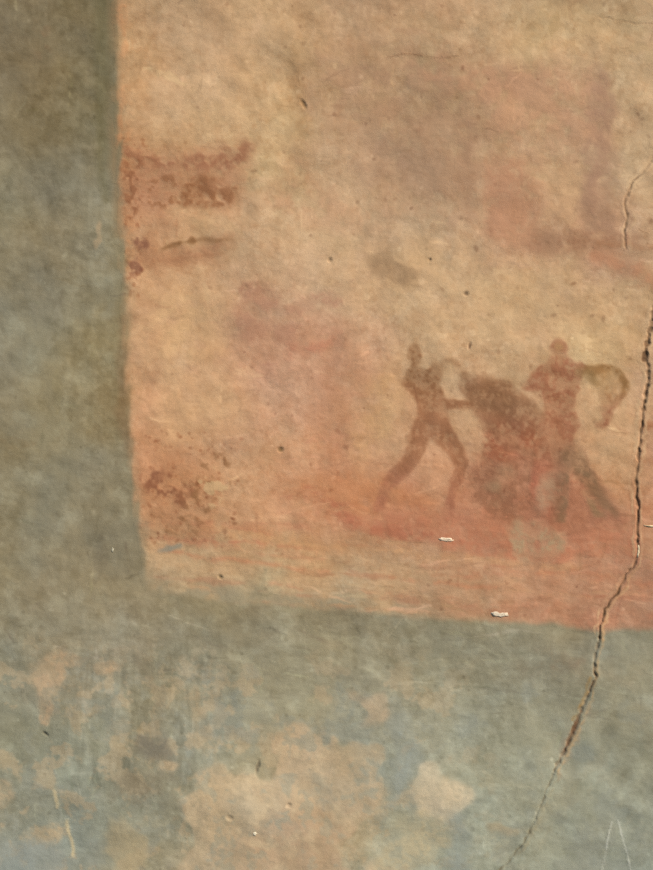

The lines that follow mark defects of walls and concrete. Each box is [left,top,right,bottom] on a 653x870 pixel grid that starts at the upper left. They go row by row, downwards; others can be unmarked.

crack [619,138,653,253]
crack [497,294,653,870]